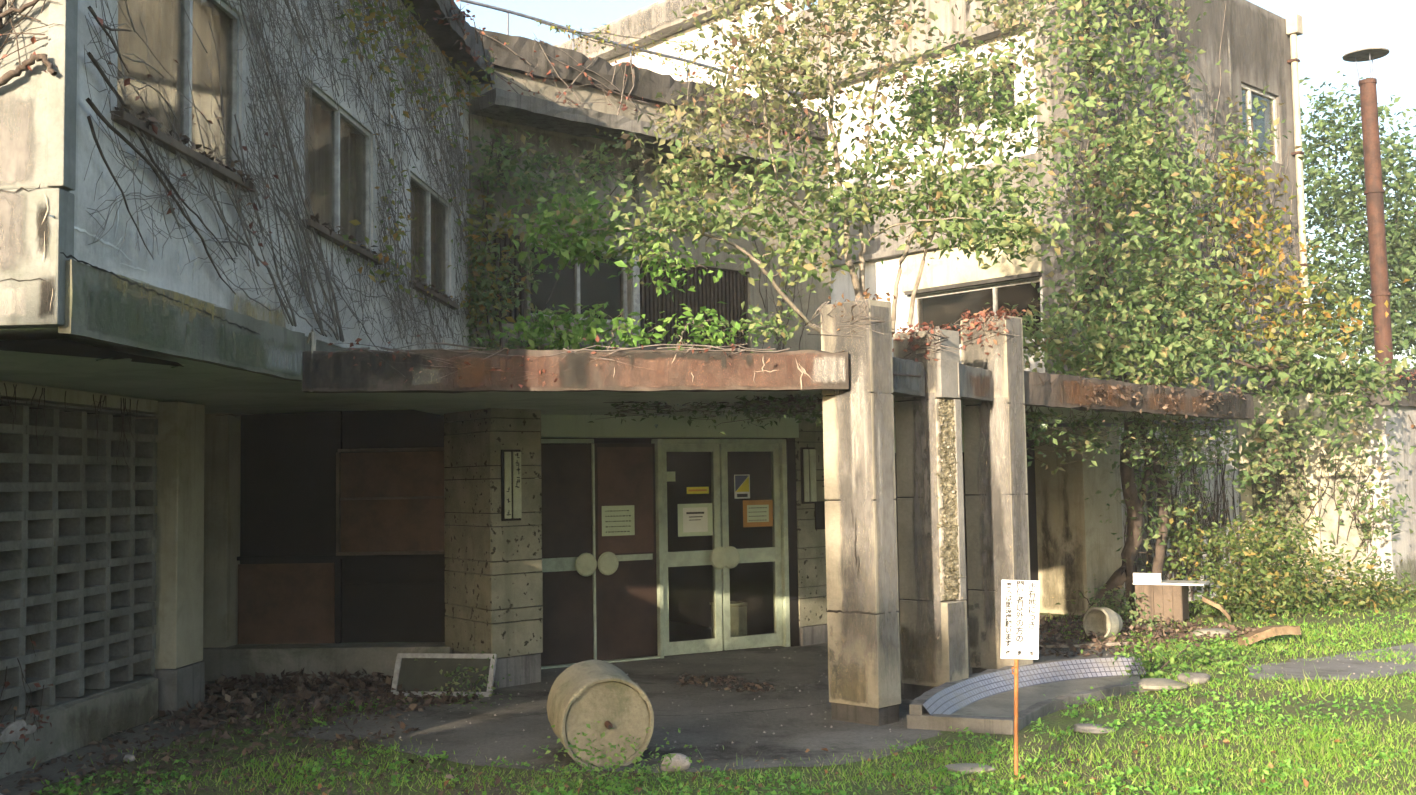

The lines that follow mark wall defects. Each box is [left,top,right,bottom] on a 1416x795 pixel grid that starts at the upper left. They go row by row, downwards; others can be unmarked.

leakage [0,99,33,267]
leakage [115,274,235,341]
corrosion [599,353,820,388]
corrosion [1061,381,1206,413]